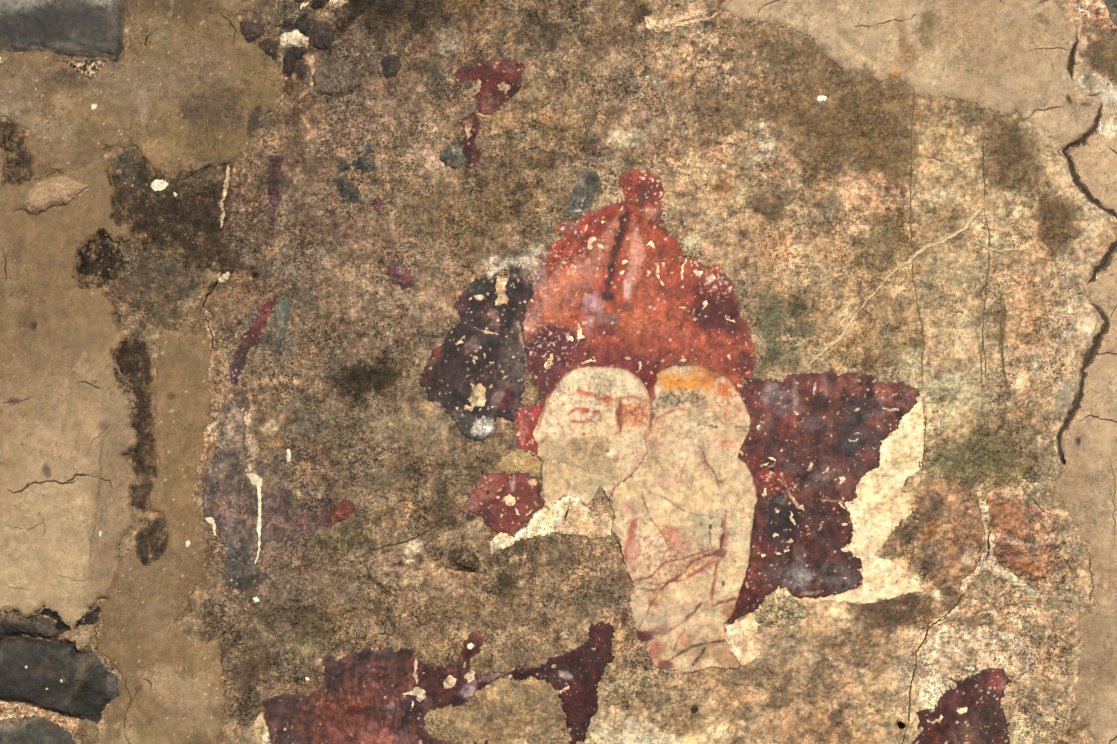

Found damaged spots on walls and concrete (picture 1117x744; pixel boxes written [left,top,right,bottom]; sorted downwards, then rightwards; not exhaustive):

flaking render [644,0,726,32]
crack [1023,106,1062,120]
crack [1029,31,1117,465]
crack [6,426,133,581]
flaking render [490,496,613,554]
flaking render [725,396,1058,665]
crack [1023,490,1057,516]
crack [1108,455,1116,541]
crack [1064,552,1094,607]
flaking render [0,606,119,744]
flaking render [916,624,1039,710]
flaking render [250,712,271,744]